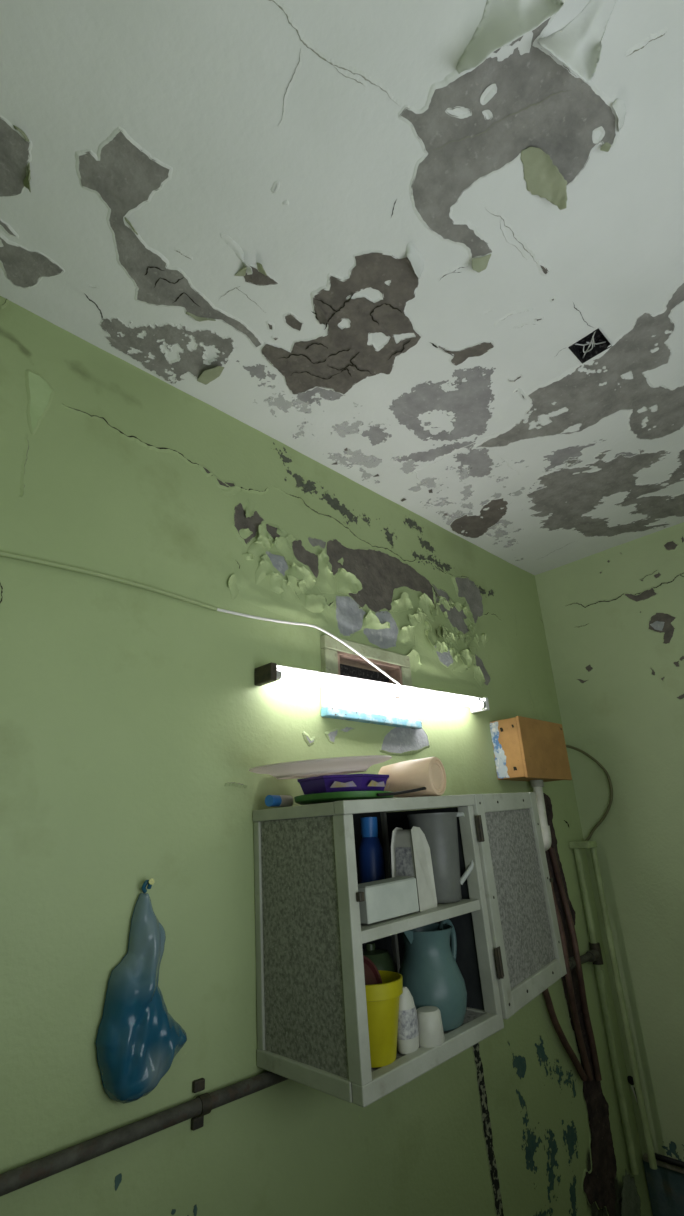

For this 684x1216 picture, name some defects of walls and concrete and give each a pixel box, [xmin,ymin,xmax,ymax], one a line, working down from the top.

crack [269,0,402,128]
peeling [0,114,32,198]
peeling [398,0,626,273]
peeling [0,218,65,289]
spalling [75,127,684,552]
crack [61,403,503,622]
crack [414,425,520,480]
peeling [624,572,677,645]
peeling [508,793,617,1216]